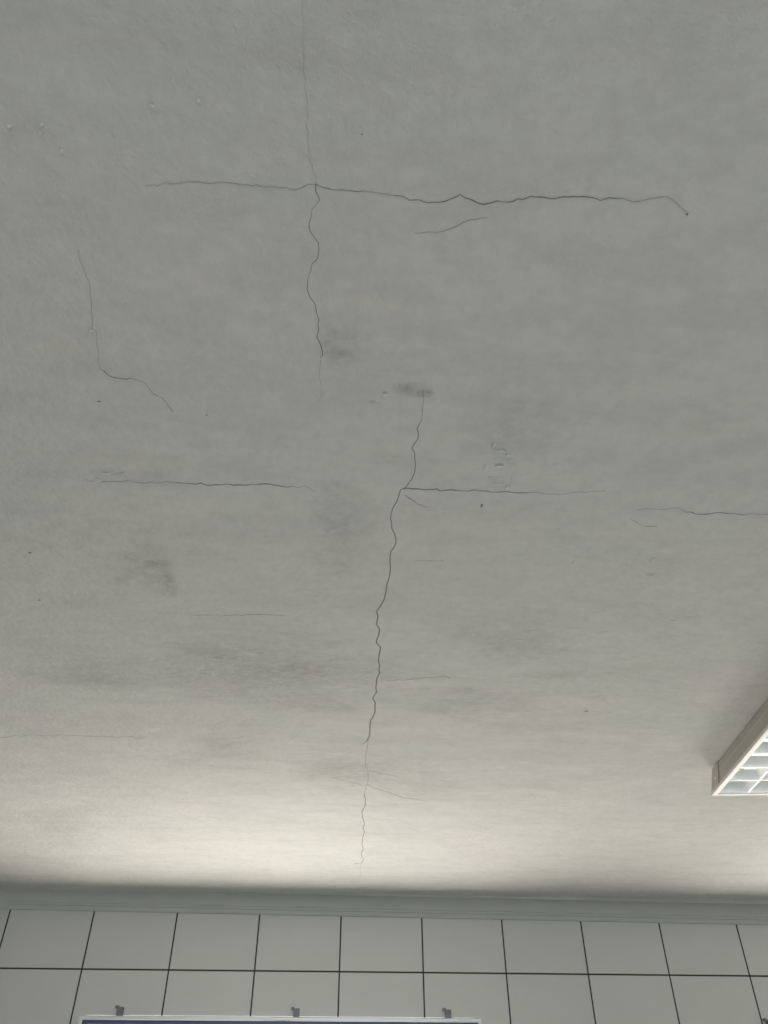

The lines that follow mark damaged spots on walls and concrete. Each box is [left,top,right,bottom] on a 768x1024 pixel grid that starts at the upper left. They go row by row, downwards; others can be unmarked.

crack [79,258,173,412]
crack [145,144,677,401]
crack [86,479,314,491]
crack [633,508,766,527]
crack [355,389,606,867]